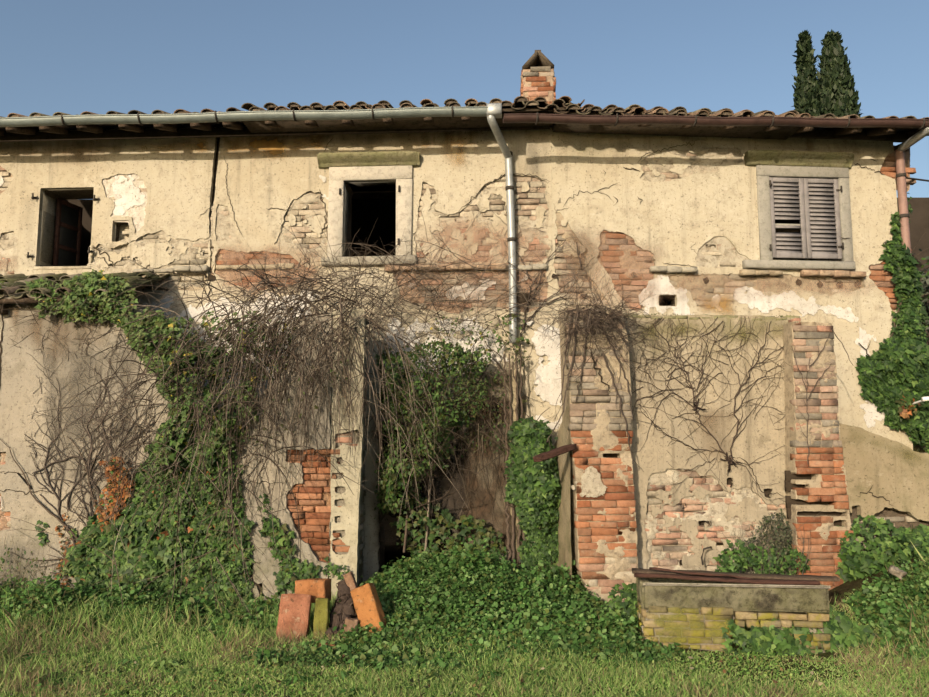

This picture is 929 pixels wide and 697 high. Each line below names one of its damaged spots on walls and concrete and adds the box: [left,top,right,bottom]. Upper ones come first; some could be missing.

spalling [0,166,13,194]
crack [199,124,241,233]
crack [0,314,8,386]
spalling [0,231,19,276]
spalling [87,174,328,418]
spalling [385,175,899,429]
crack [0,470,59,495]
spalling [287,449,341,563]
spalling [644,469,786,573]